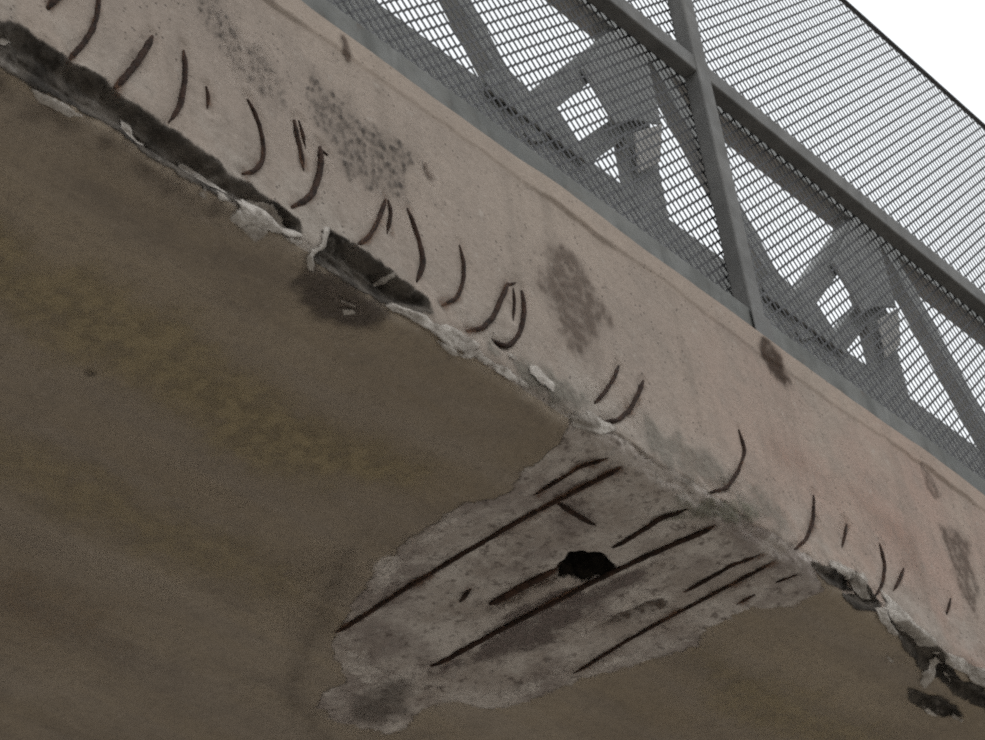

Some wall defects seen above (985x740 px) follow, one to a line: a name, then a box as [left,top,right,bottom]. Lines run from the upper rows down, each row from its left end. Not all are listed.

spalling [0,0,328,246]
corrosion [342,35,351,62]
spalling [307,198,555,391]
spalling [316,365,985,734]